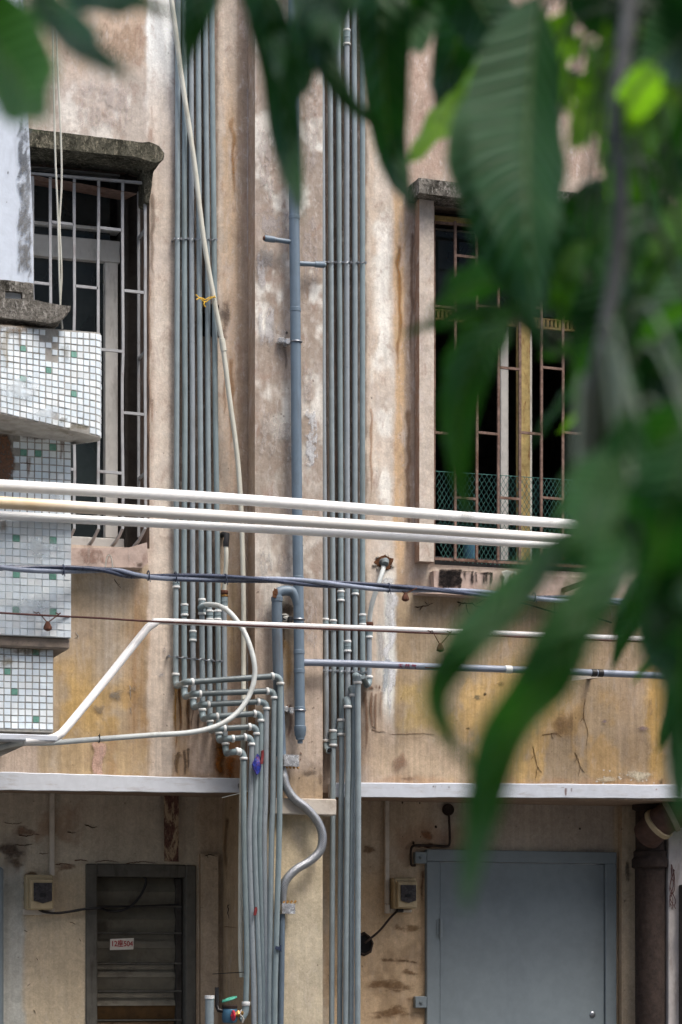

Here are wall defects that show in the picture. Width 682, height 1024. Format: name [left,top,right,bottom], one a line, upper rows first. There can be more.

peeling [304,375,318,466]
crack [532,703,588,778]